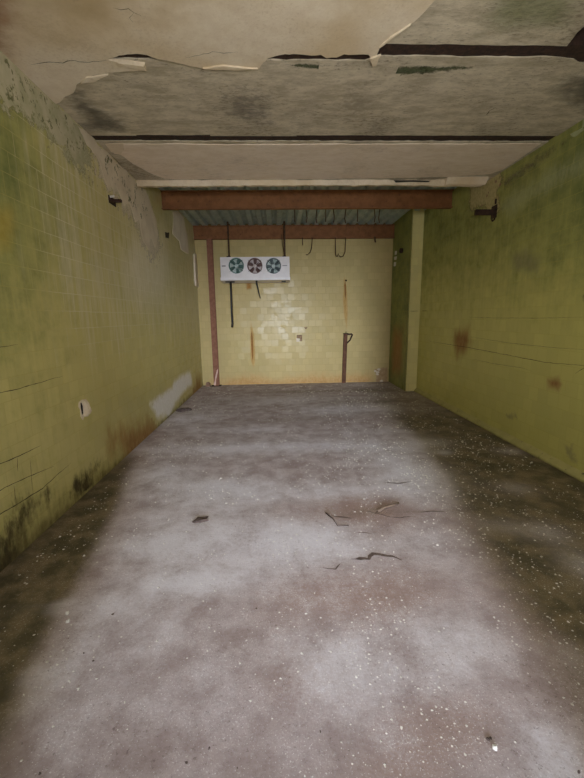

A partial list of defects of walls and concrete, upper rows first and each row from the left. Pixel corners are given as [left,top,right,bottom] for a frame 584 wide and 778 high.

flaking render [0,0,541,263]
rust [180,315,378,406]
rust [389,317,407,387]
crack [0,446,65,514]
water stain [0,399,157,572]
crack [326,508,444,570]